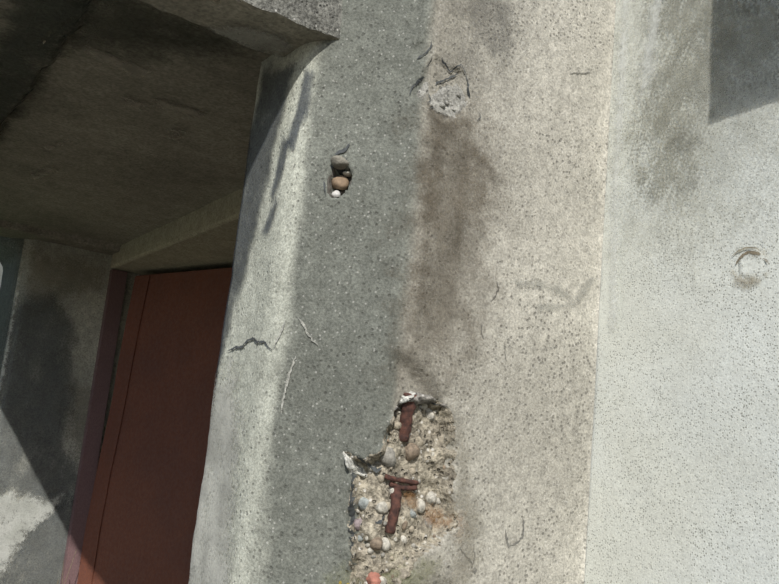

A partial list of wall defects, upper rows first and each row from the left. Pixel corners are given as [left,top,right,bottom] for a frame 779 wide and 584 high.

spalling [409,59,470,119]
spalling [324,143,352,198]
leakage [188,67,311,584]
crack [228,318,318,351]
crack [281,356,296,413]
leakage [0,284,77,584]
spalling [343,391,459,584]